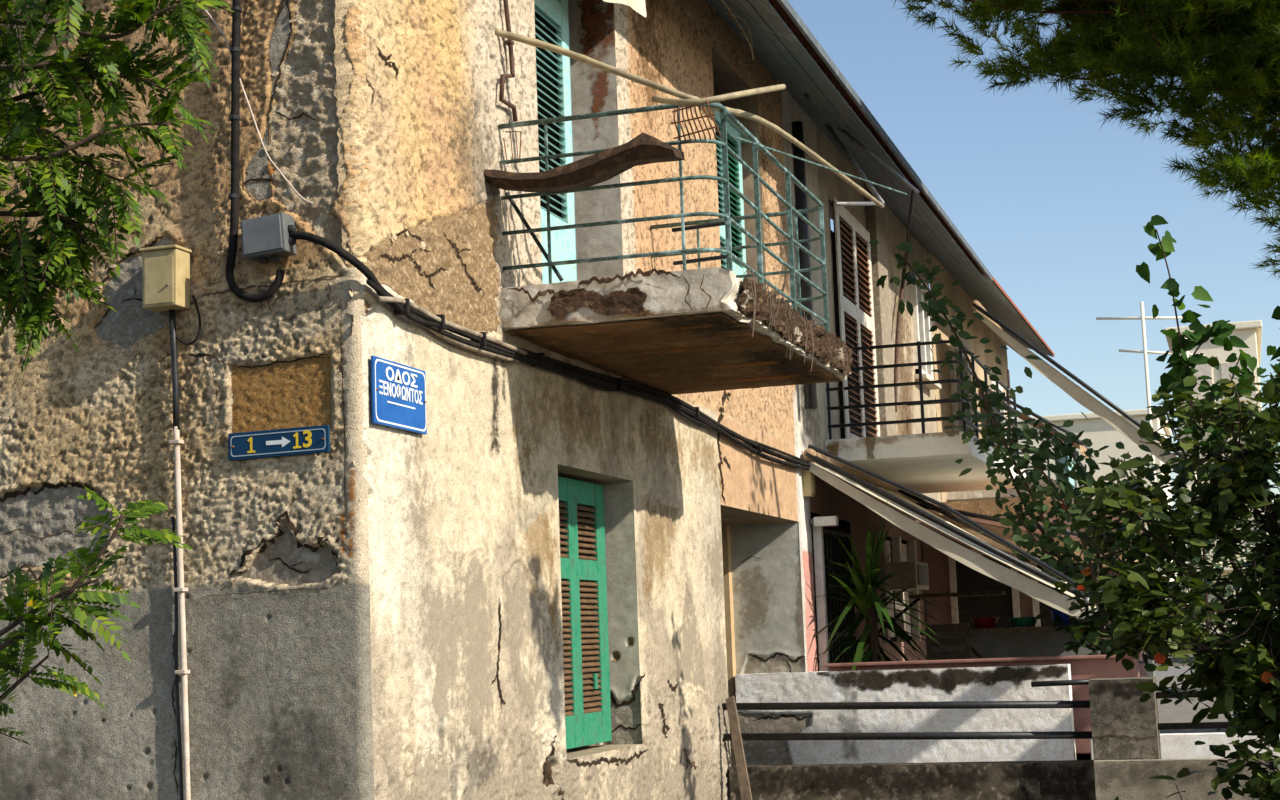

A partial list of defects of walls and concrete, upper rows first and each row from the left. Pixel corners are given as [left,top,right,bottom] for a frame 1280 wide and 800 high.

crack [273,102,319,124]
spalling [246,0,682,334]
spalling [93,235,180,347]
crack [196,233,485,544]
crack [718,390,732,504]
spalling [0,477,113,578]
spalling [230,511,338,586]
crack [492,597,506,706]
water stain [817,664,1068,695]
crack [543,680,697,800]